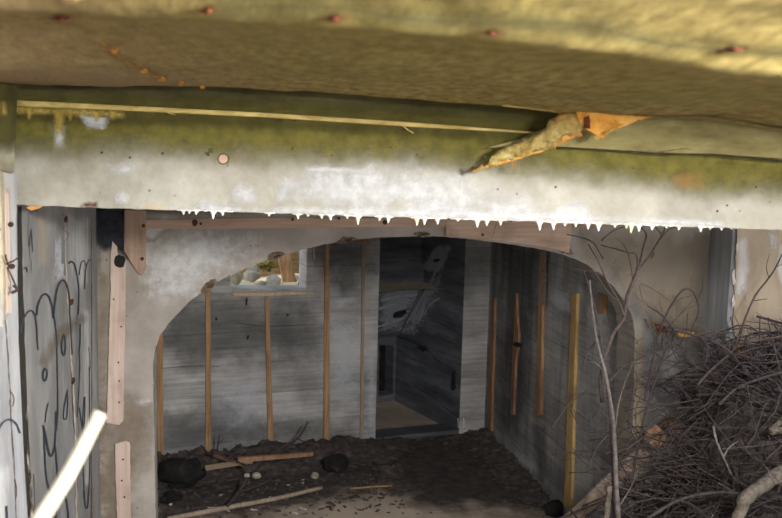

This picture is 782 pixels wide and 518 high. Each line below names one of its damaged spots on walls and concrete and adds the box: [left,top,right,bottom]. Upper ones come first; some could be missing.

spalling [575,112,651,141]
water stain [28,208,97,440]
water stain [78,439,95,490]
water stain [196,359,284,451]
water stain [314,263,441,439]
water stain [117,168,719,333]
water stain [595,241,708,503]
water stain [735,229,782,362]